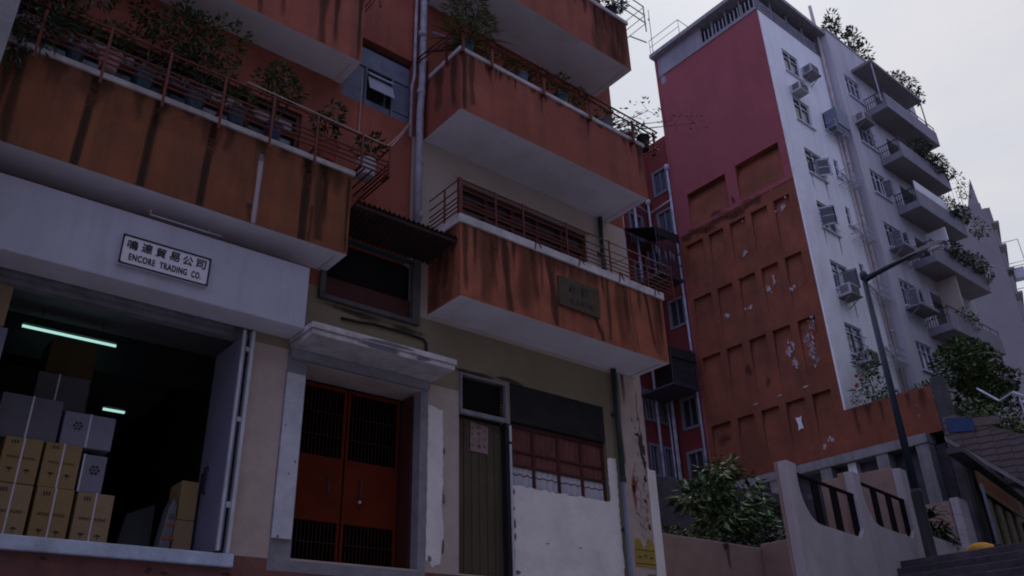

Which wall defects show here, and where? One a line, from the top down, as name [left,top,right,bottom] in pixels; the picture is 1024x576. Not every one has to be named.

water stain [70,71,110,165]
water stain [136,92,168,187]
water stain [196,119,234,206]
water stain [247,139,267,224]
water stain [298,157,350,248]
water stain [435,52,516,108]
water stain [491,234,515,304]
water stain [531,250,611,342]
peeling [786,316,820,369]
peeling [631,392,651,536]